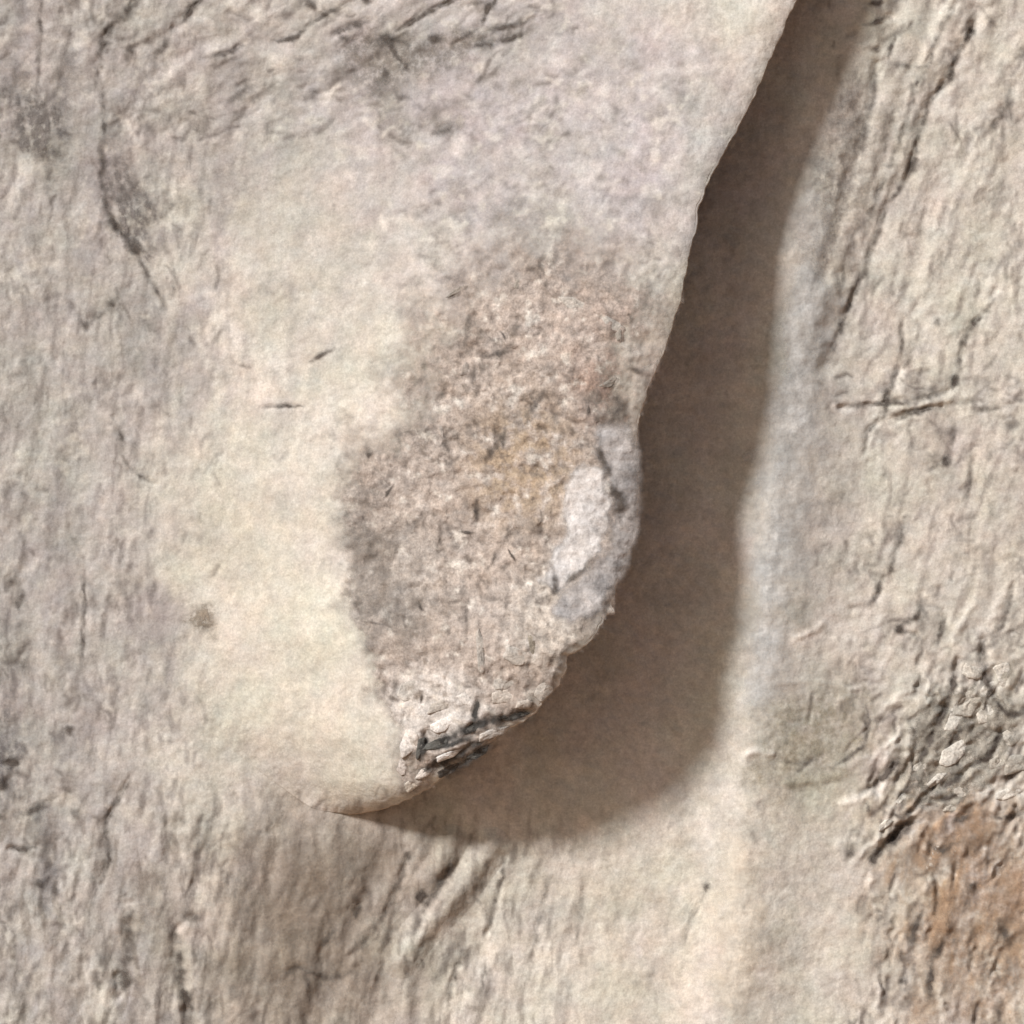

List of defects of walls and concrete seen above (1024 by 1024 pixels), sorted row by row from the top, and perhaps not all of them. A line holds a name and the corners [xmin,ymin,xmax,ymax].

flaking render [155,0,797,815]
crack [859,317,981,431]
peeling [870,649,1024,864]